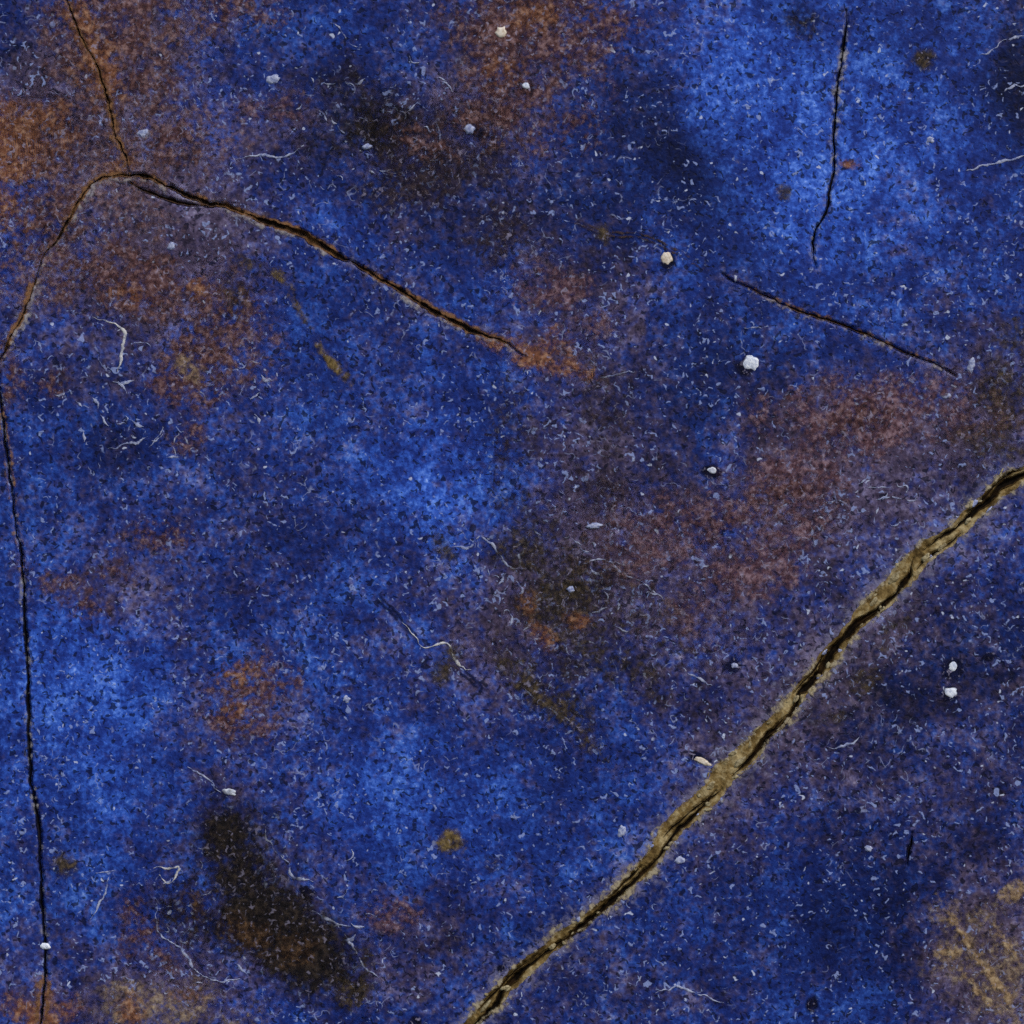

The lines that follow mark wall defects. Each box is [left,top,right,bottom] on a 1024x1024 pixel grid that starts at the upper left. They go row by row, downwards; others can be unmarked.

crack [0,0,523,359]
crack [577,223,955,375]
crack [811,10,848,265]
crack [0,389,51,1024]
crack [378,596,484,691]
crack [464,466,1024,1024]
leakage [160,795,369,1006]